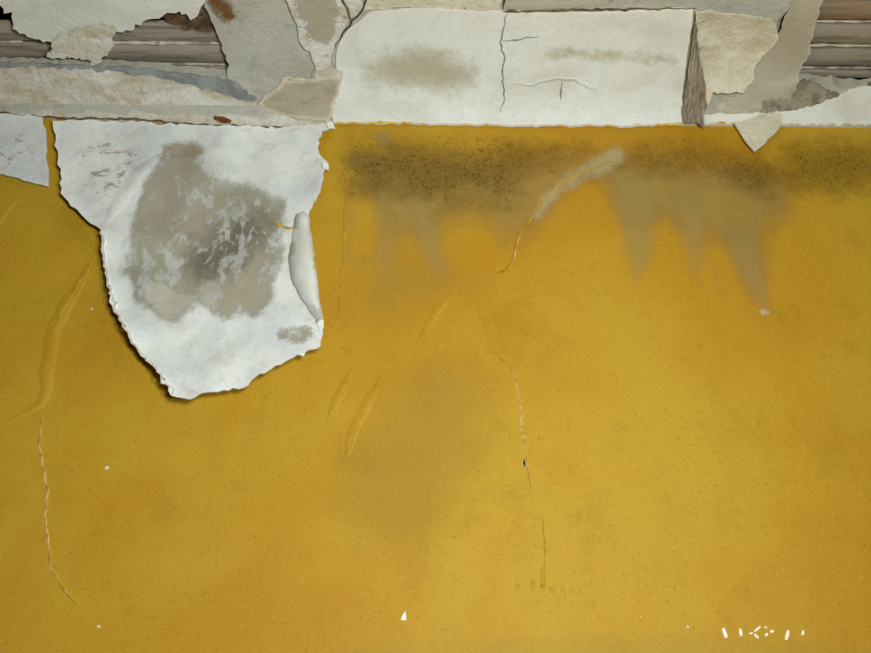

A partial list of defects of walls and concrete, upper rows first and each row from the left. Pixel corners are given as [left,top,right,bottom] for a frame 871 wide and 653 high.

peeling [0,0,205,66]
peeling [286,0,363,79]
crack [335,0,367,48]
crack [500,0,696,112]
flaking render [682,0,823,152]
peeling [0,113,335,400]
damp [125,143,286,319]
damp [364,158,566,226]
damp [607,165,782,256]